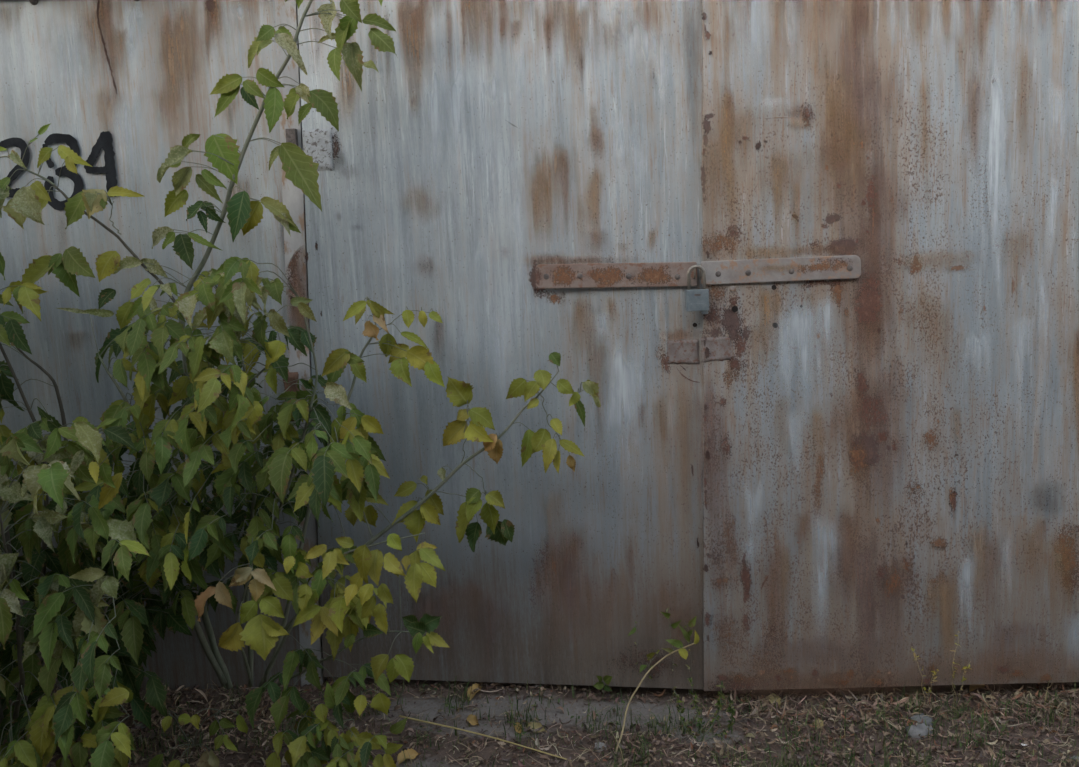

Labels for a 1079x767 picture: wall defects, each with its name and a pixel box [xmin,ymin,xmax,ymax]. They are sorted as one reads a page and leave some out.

corrosion [205,0,221,46]
corrosion [400,3,422,74]
corrosion [789,102,815,127]
corrosion [701,225,743,255]
corrosion [821,213,842,228]
corrosion [529,255,674,304]
corrosion [754,237,883,330]
corrosion [893,253,973,275]
corrosion [704,284,743,343]